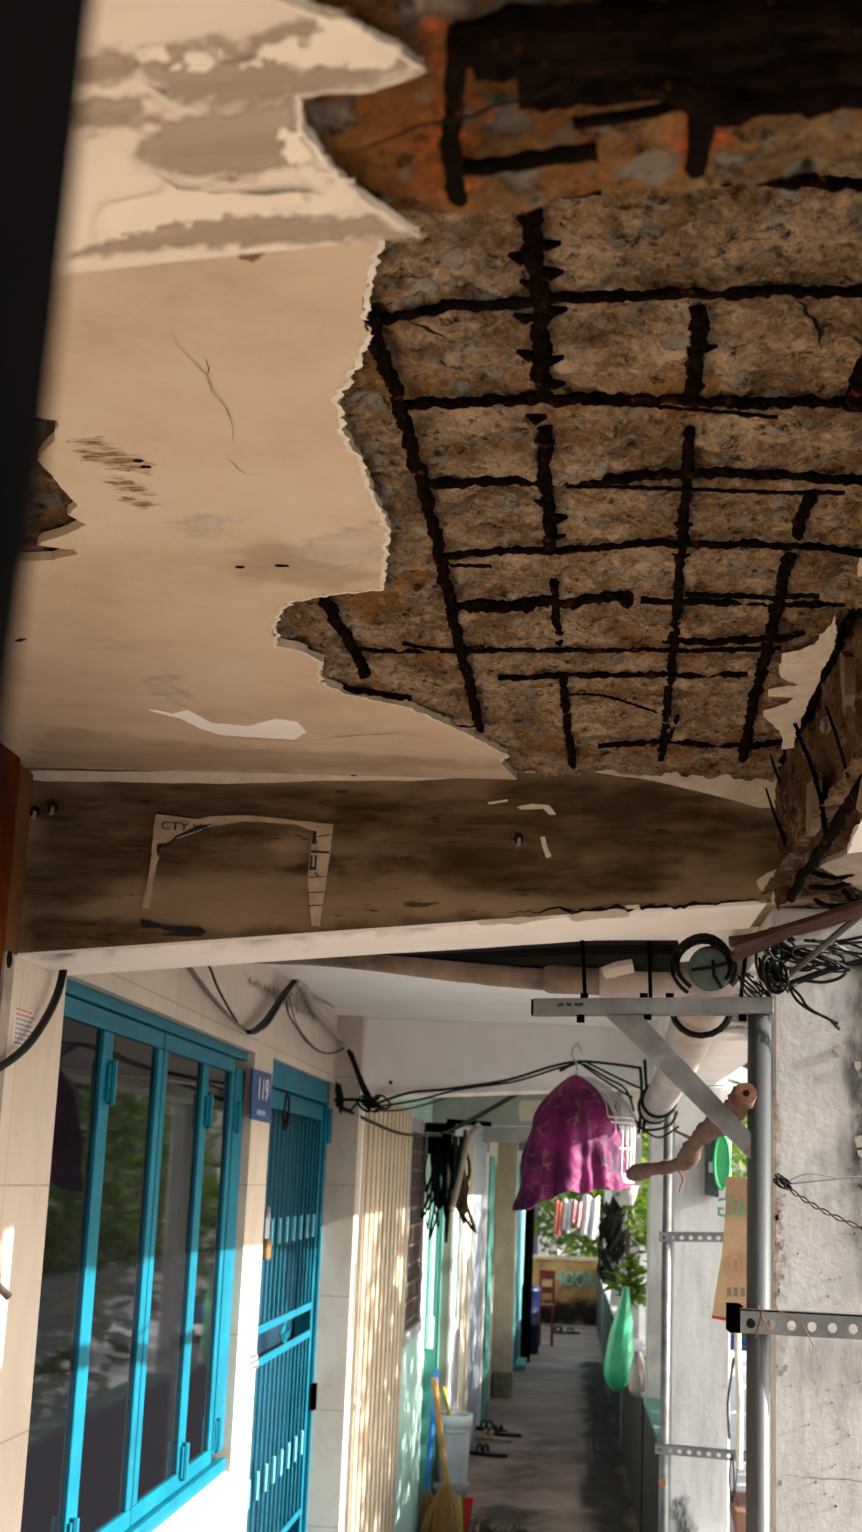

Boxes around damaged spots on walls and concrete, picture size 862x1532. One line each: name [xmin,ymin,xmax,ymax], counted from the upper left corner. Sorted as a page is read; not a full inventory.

spalling [517,70,656,113]
peeling [74,0,509,763]
damp [24,782,735,958]
damp [845,1040,862,1180]